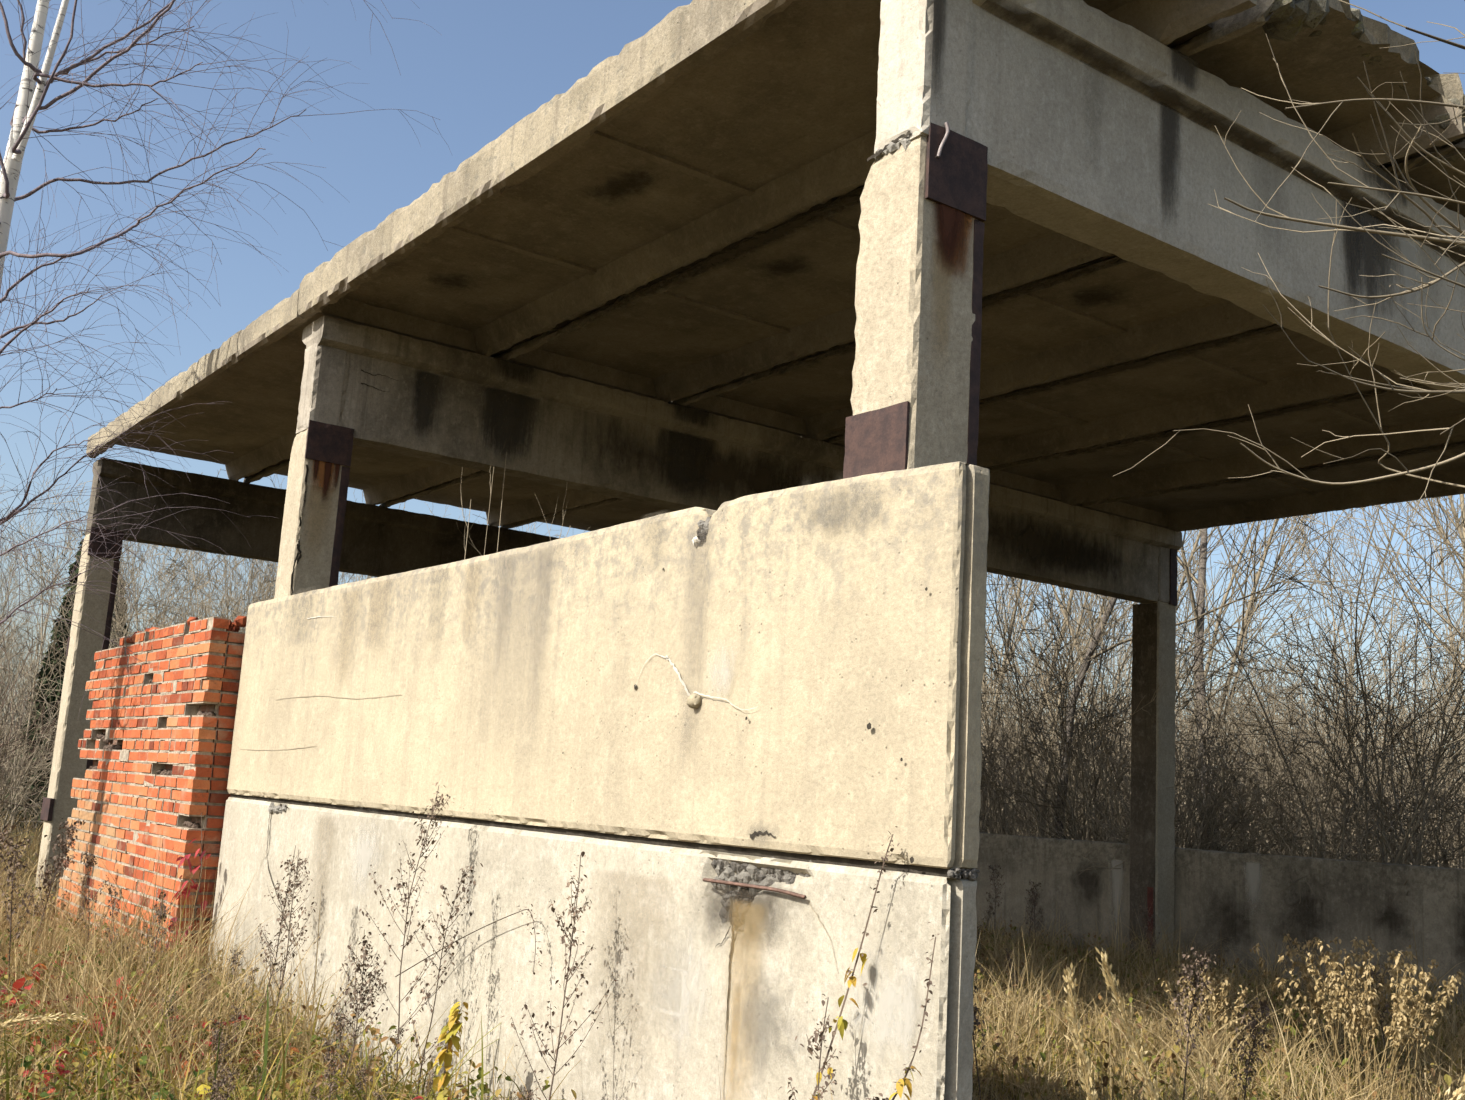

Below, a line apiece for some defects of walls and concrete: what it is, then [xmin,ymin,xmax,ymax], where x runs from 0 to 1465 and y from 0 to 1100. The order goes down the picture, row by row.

leakage [1172,49,1197,88]
spalling [1262,0,1330,42]
spalling [1348,8,1382,65]
leakage [1162,105,1179,205]
spalling [1428,94,1465,162]
rust [937,202,973,268]
leakage [1344,202,1416,320]
leakage [413,371,441,428]
leakage [484,359,537,452]
rust [313,460,340,497]
spalling [702,855,816,936]